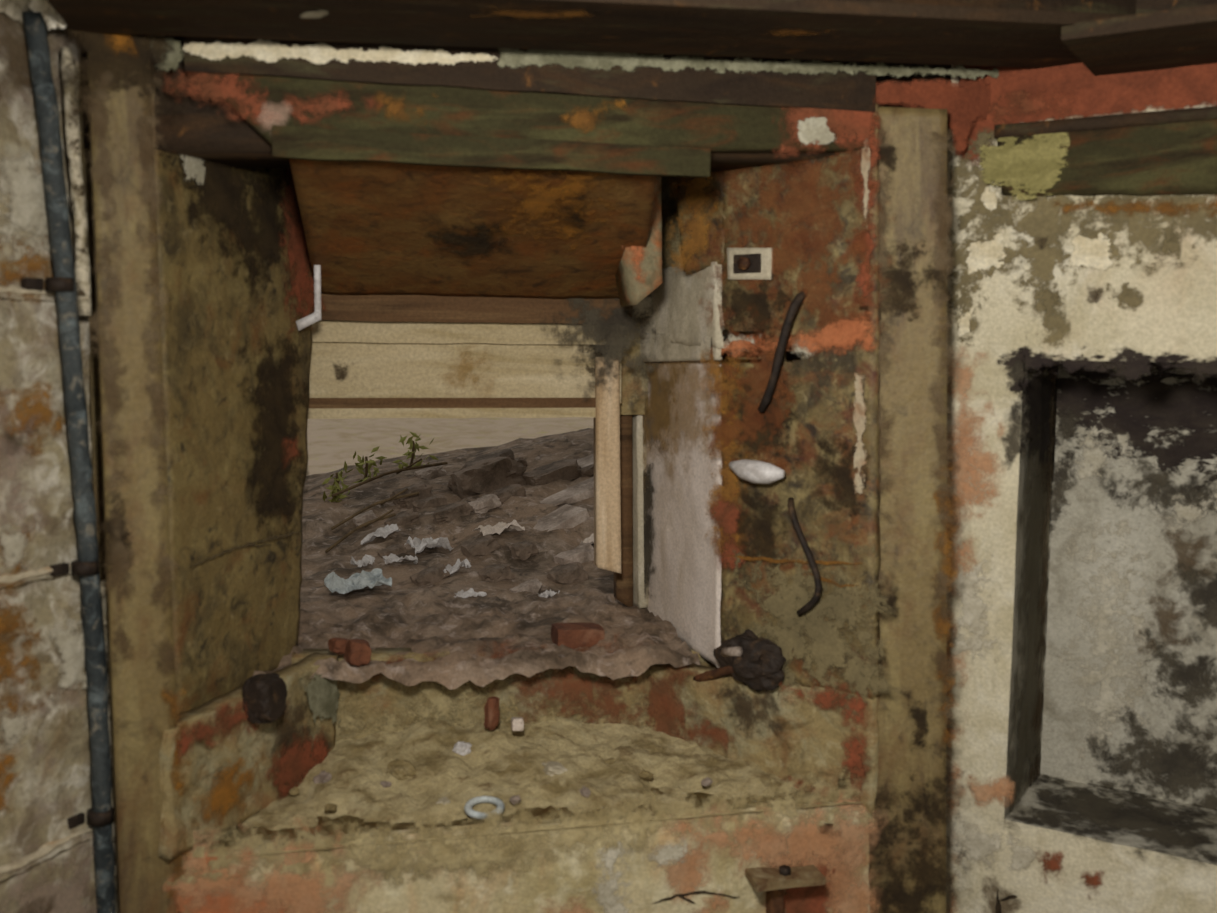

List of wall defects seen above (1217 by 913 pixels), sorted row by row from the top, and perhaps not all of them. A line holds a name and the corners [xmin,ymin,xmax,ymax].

flaking render [0,0,68,30]
peeling [0,146,50,260]
peeling [149,35,1217,307]
damp [947,130,1217,346]
flaking render [957,307,974,337]
damp [242,337,309,541]
peeling [853,373,867,494]
damp [1002,360,1028,462]
corrosion [0,603,41,719]
peeling [50,620,87,698]
corrosion [0,755,15,810]
peeling [648,797,877,913]